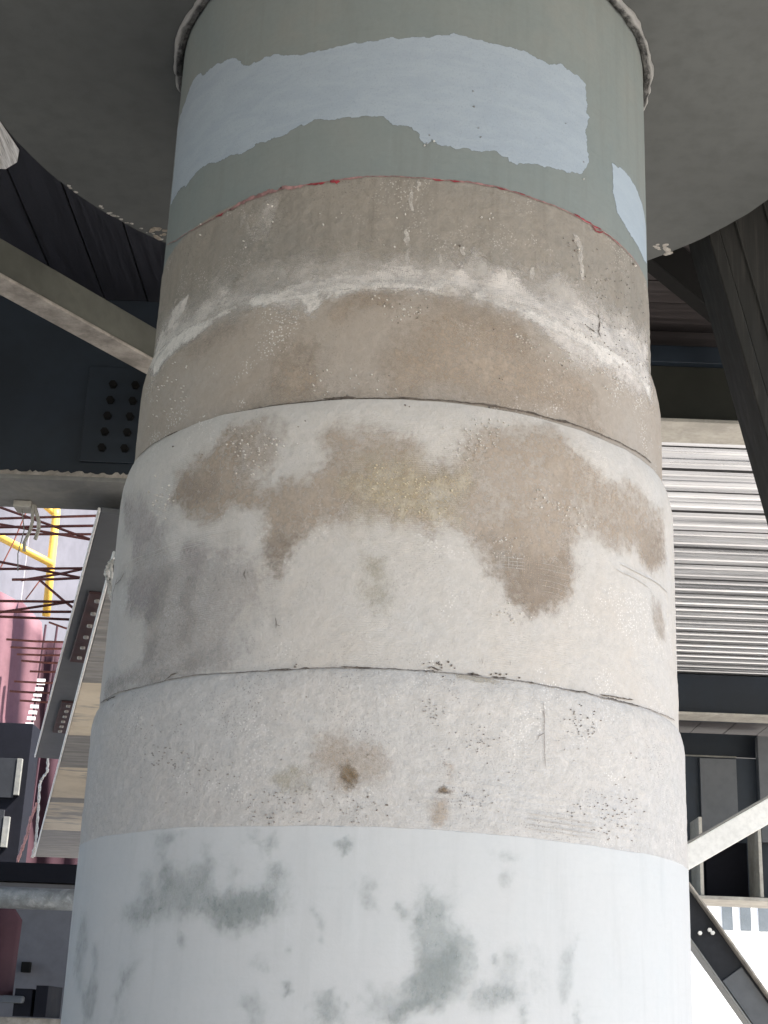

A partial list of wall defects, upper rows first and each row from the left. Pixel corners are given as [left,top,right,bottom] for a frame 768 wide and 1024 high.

water stain [166,295,189,334]
water stain [172,429,662,612]